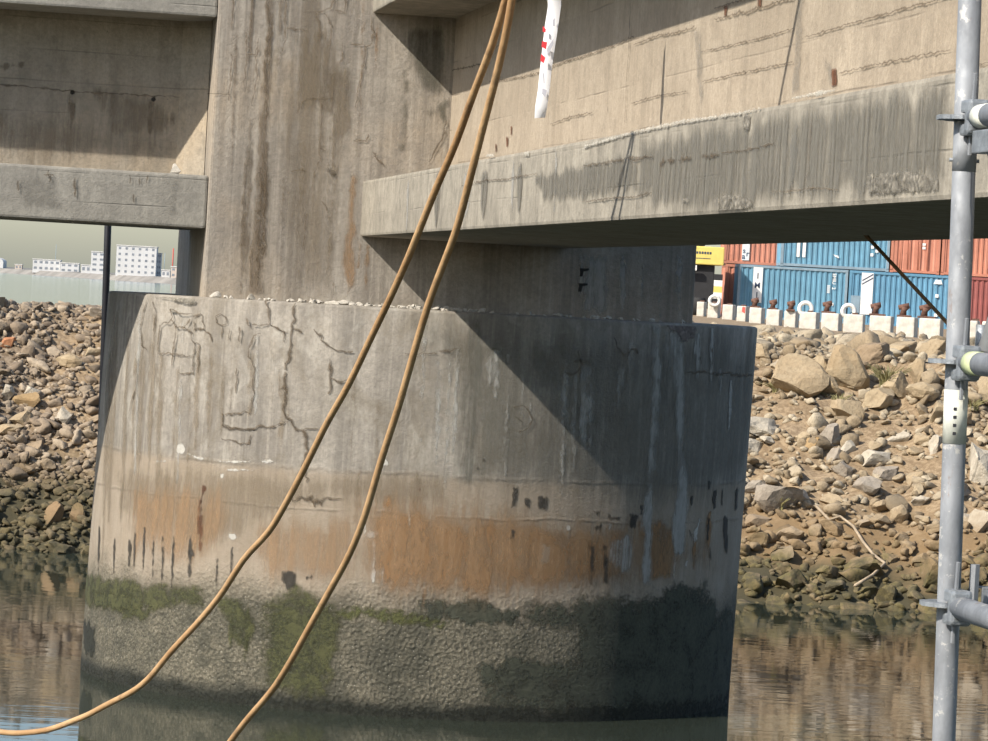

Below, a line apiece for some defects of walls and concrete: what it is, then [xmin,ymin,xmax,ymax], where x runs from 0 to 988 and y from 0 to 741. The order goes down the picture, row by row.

water stain [240,0,281,293]
crack [211,0,375,245]
water stain [463,171,487,217]
water stain [511,163,522,212]
water stain [535,93,943,205]
crack [129,167,353,507]
water stain [128,527,175,587]
water stain [281,571,312,589]